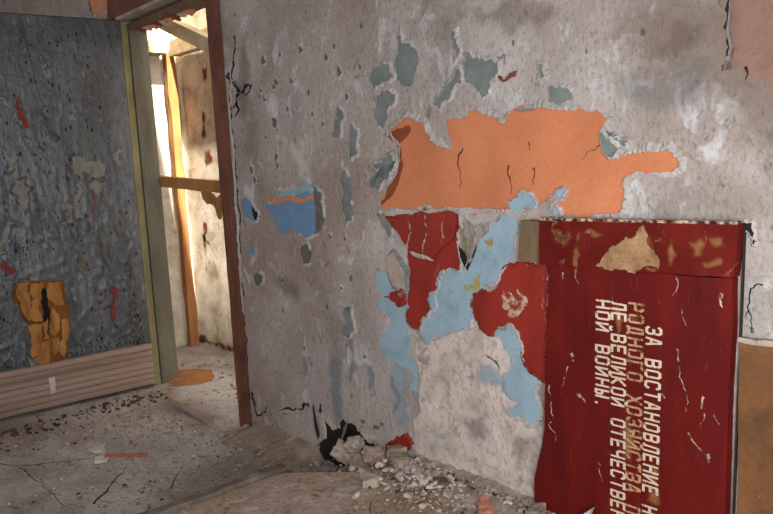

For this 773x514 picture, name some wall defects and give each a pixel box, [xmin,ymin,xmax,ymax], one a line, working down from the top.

peeling [88,0,108,19]
peeling [723,0,773,88]
crack [226,35,252,367]
flaking render [241,180,332,267]
peeling [319,23,687,497]
crack [249,391,309,417]